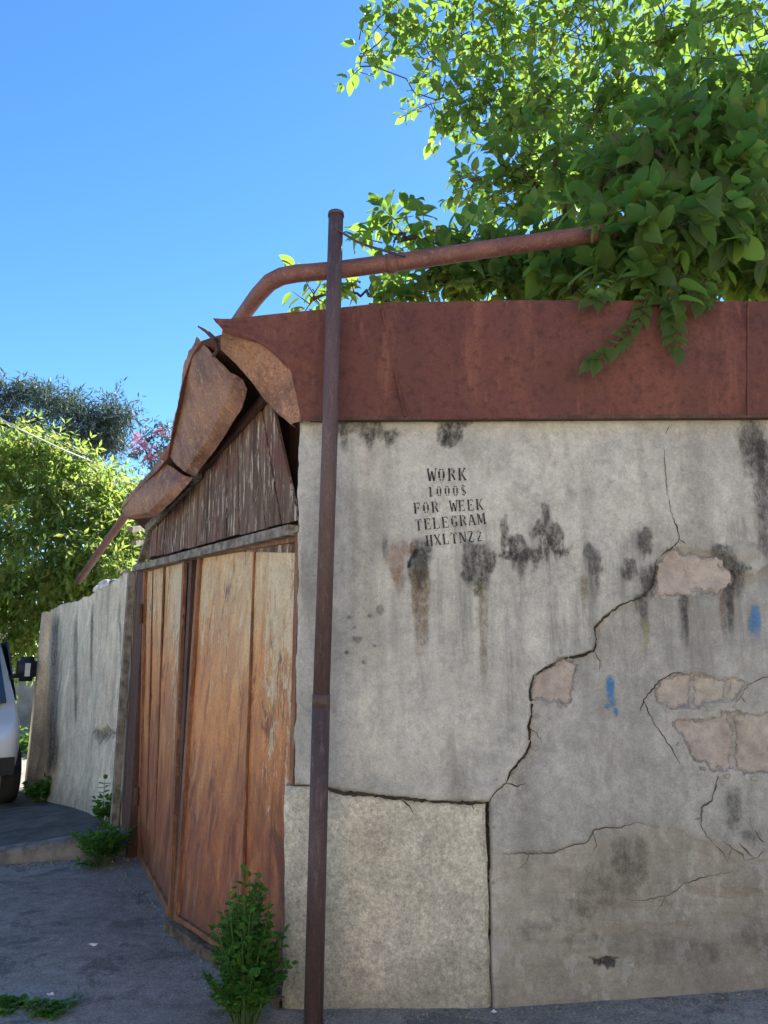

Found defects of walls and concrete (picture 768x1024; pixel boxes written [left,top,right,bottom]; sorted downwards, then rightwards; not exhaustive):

water stain [441,422,468,447]
water stain [740,421,768,552]
water stain [461,505,567,594]
water stain [583,545,602,587]
water stain [622,528,659,619]
flaking render [655,548,734,601]
crack [328,427,686,939]
flaking render [528,657,577,709]
flaking render [655,673,768,781]
crack [734,676,768,703]
crack [623,776,765,907]